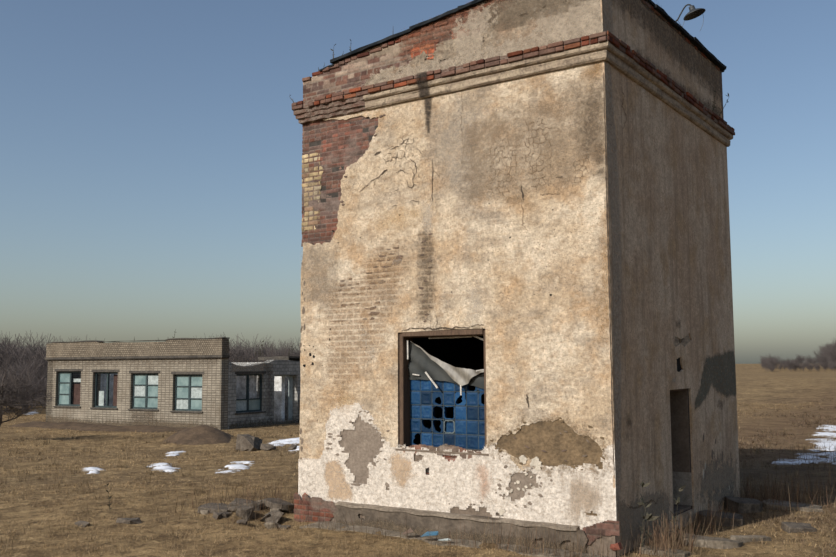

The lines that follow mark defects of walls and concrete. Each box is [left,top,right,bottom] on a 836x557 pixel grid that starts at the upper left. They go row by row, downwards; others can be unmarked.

flaking render [303,0,515,101]
water stain [416,71,431,132]
water stain [399,0,578,61]
water stain [618,0,721,115]
spalling [301,114,385,247]
crack [362,137,439,206]
peeling [294,403,623,550]